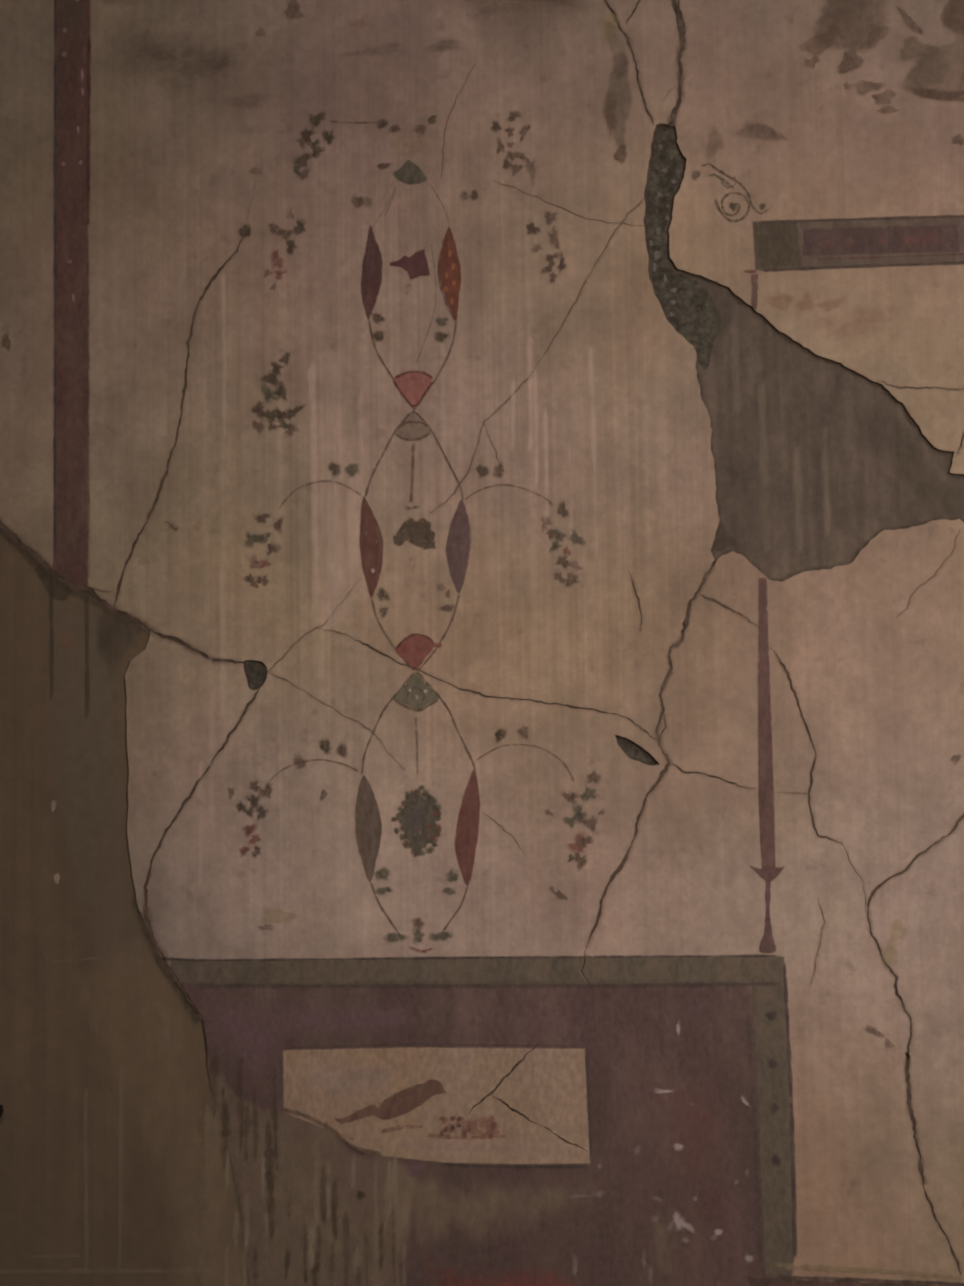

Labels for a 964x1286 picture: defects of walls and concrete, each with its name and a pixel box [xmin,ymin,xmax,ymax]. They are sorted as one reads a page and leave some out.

crack [604,0,686,128]
damp [907,63,964,101]
crack [431,180,646,513]
flaking render [643,123,964,582]
crack [877,380,962,390]
crack [0,236,244,664]
crack [896,530,960,618]
flaking render [243,660,267,690]
flaking render [615,735,660,765]
crack [143,561,964,1274]